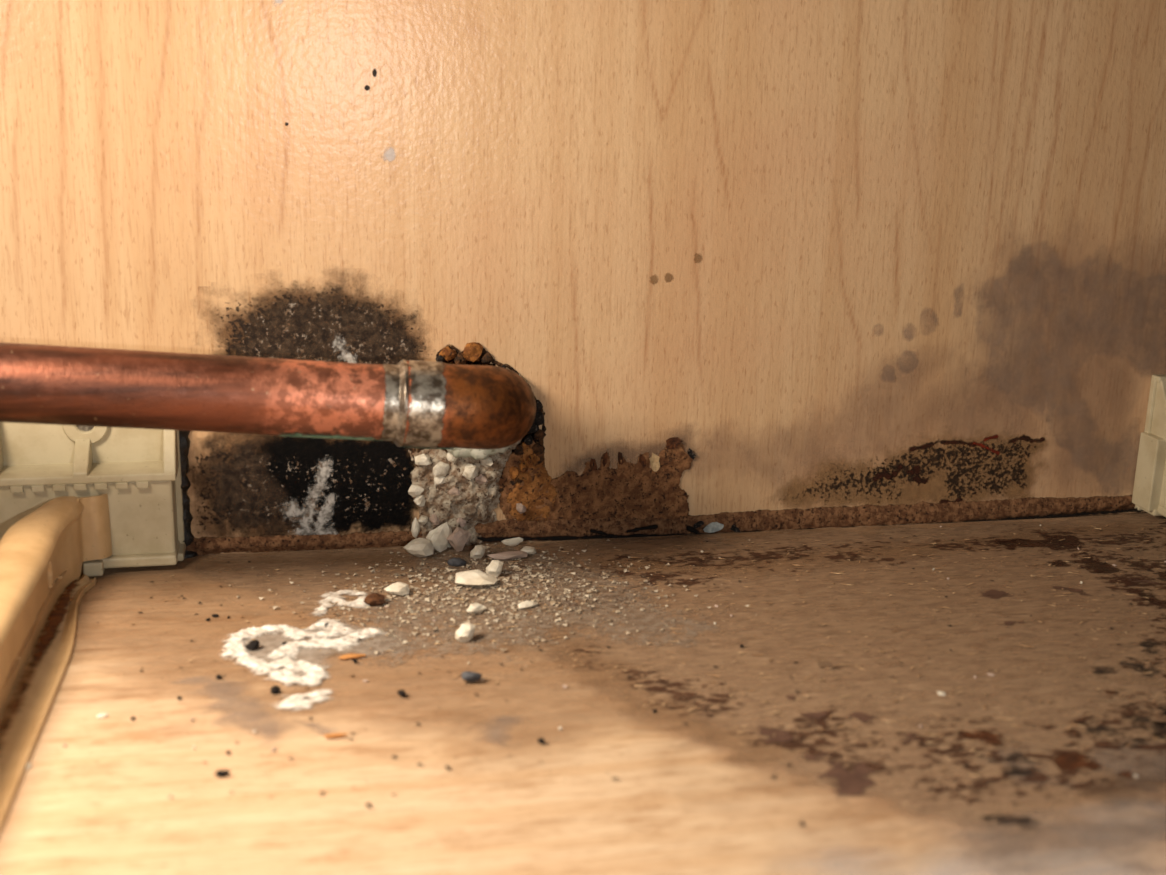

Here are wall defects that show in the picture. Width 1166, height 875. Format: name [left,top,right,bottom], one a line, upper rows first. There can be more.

water stain [214,287,426,365]
spalling [435,342,519,374]
peeling [498,385,696,521]
water stain [179,430,1166,855]